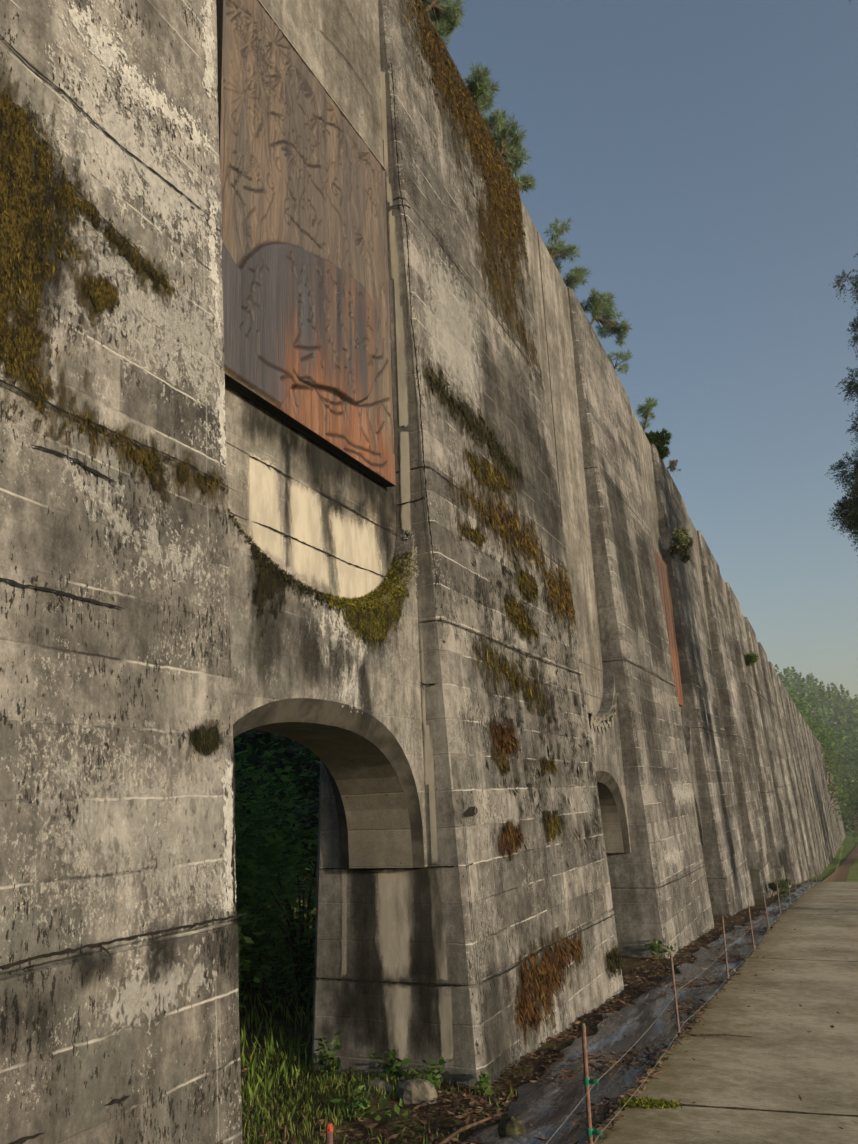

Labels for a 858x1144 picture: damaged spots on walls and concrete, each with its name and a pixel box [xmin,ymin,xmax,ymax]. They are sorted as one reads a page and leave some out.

water stain [30,146,104,336]
water stain [0,260,228,515]
crack [0,379,237,492]
water stain [245,71,411,599]
crack [248,2,543,577]
crack [0,578,125,609]
crack [0,743,248,969]
water stain [336,683,453,1061]
crack [10,1133,45,1144]